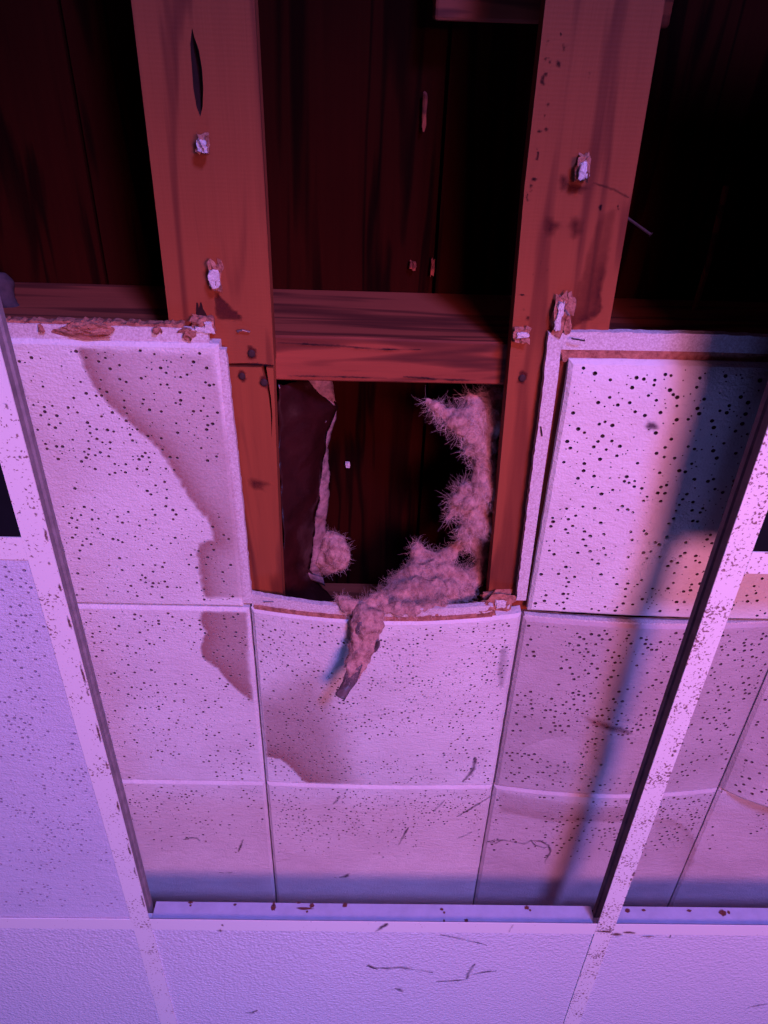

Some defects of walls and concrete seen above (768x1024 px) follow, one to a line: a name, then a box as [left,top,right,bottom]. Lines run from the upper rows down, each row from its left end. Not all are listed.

leakage [80,350,226,596]
leakage [202,612,251,698]